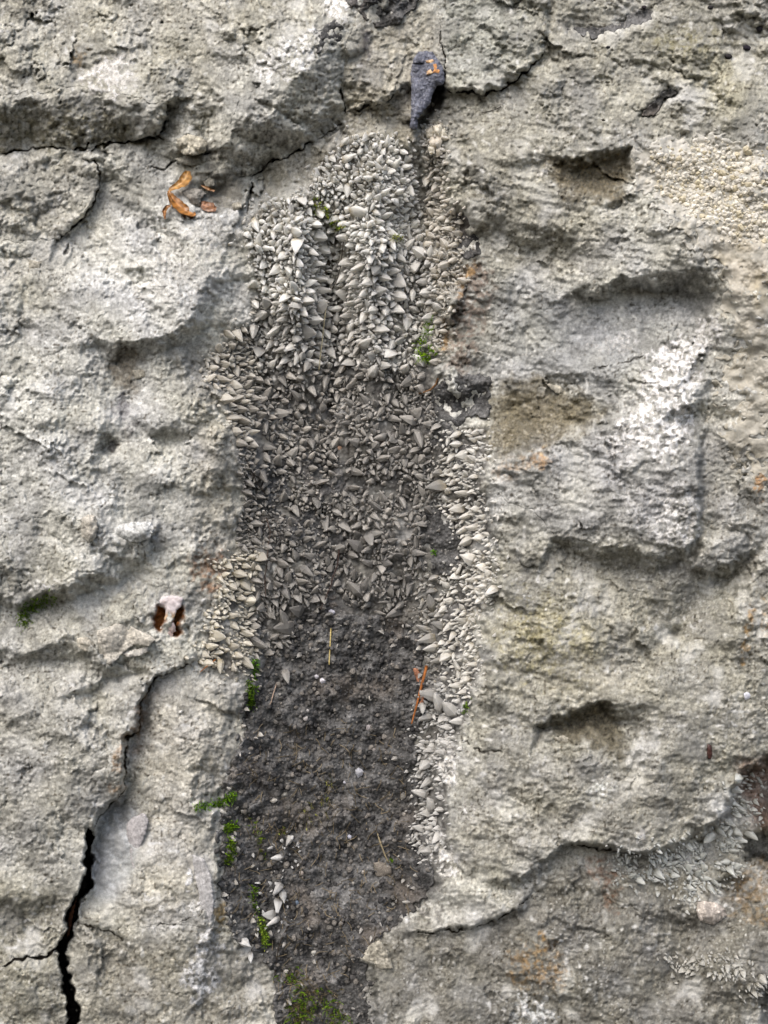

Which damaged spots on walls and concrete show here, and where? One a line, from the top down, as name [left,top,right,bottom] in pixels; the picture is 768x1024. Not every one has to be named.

crack [4,663,188,1024]
crack [577,845,639,856]
crack [417,898,534,935]